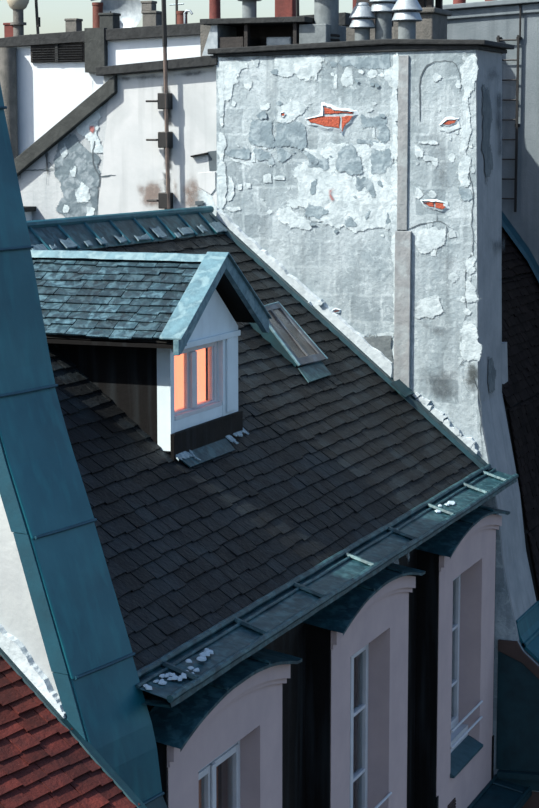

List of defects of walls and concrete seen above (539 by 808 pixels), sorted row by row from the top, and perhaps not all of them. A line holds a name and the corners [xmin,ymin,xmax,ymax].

crack [419,60,462,122]
peeling [415,50,493,202]
peeling [53,105,104,218]
peeling [216,53,398,305]
spalling [414,188,450,213]
peeling [32,222,227,250]
peeling [415,220,456,257]
peeling [446,252,479,315]
peeling [414,295,447,319]
peeling [361,315,394,358]
peeling [488,357,496,393]